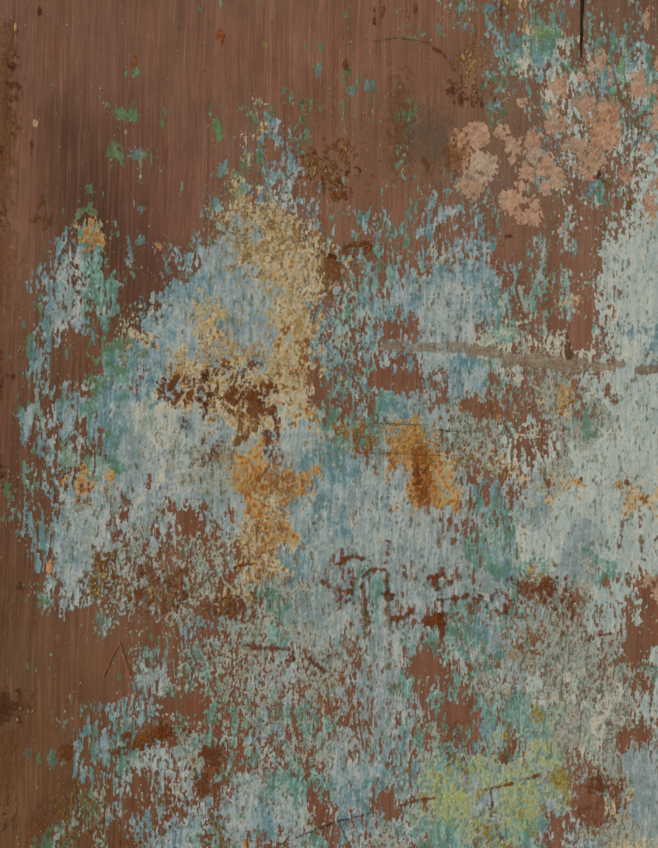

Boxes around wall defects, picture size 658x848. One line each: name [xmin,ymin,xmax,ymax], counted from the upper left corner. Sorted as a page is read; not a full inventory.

peeling [99,77,171,184]
peeling [200,86,227,146]
peeling [330,64,381,136]
peeling [380,84,428,180]
rust [156,194,372,626]
rust [333,414,452,514]
peeling [19,734,68,770]